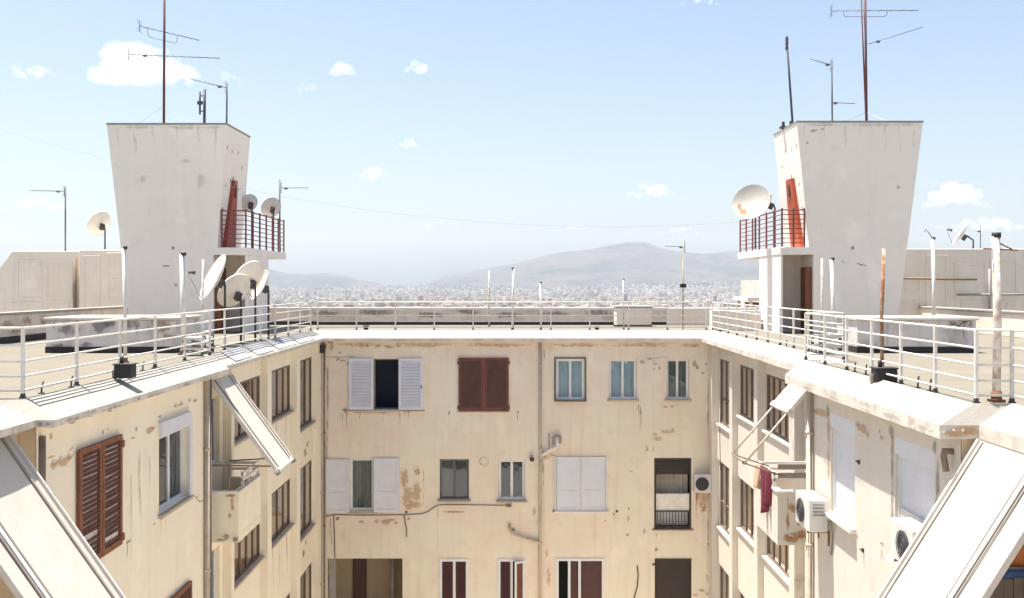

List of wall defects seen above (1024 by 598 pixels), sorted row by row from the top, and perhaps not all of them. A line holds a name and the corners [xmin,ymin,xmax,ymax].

spalling [859,402,977,436]
peeling [49,447,76,470]
peeling [399,468,424,509]